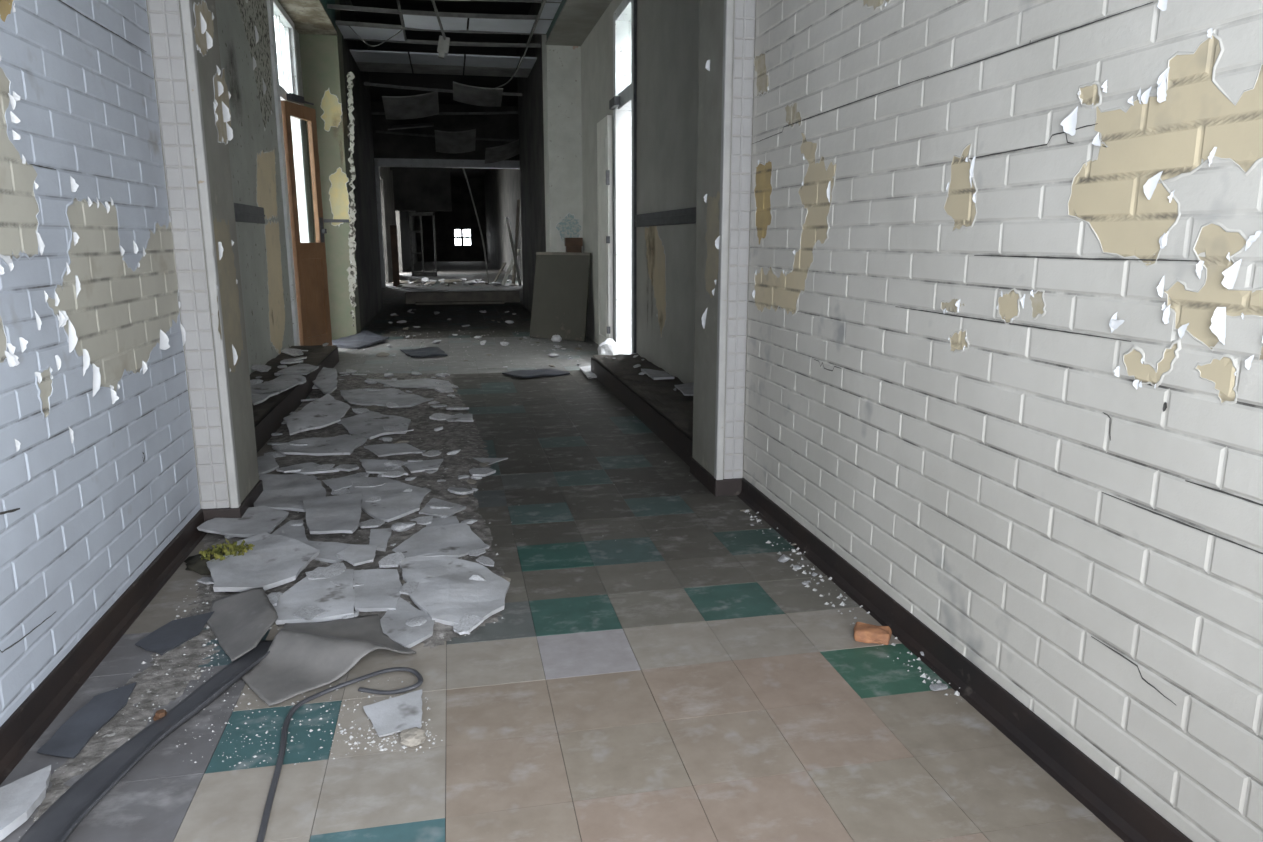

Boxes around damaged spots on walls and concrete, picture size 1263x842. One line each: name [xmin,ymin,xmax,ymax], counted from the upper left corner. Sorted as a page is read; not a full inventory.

peeling [0,0,16,24]
peeling [193,0,214,56]
peeling [213,65,233,145]
peeling [0,55,45,275]
peeling [752,102,837,316]
peeling [943,142,978,232]
peeling [1061,28,1263,406]
peeling [0,315,28,367]
peeling [34,176,186,419]